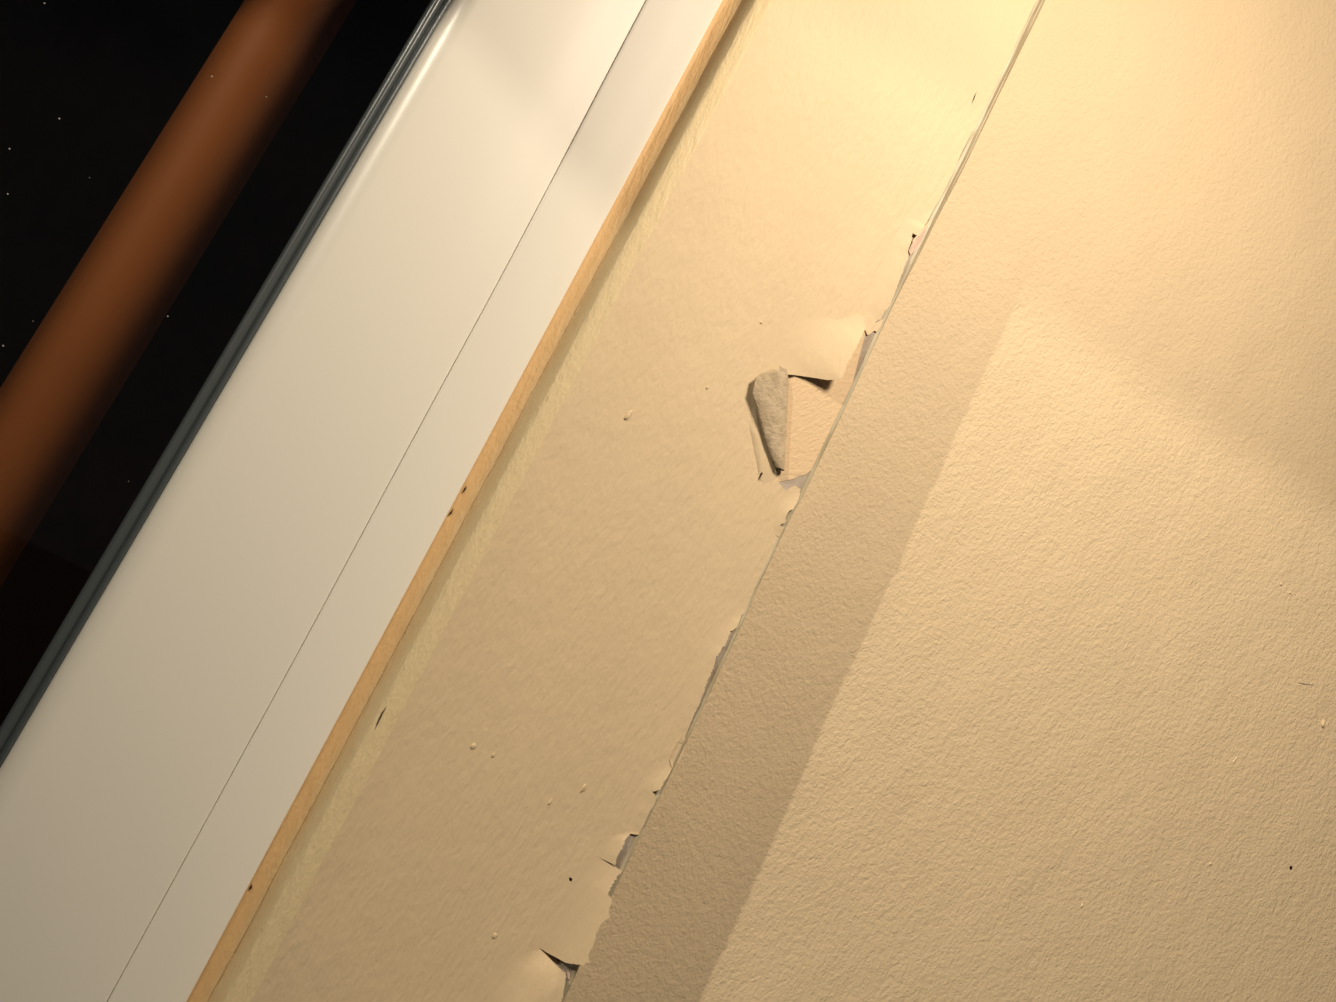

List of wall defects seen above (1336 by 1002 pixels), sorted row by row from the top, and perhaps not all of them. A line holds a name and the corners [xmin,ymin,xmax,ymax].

peeling [749,209,933,537]
peeling [676,609,745,736]
peeling [468,766,672,1002]